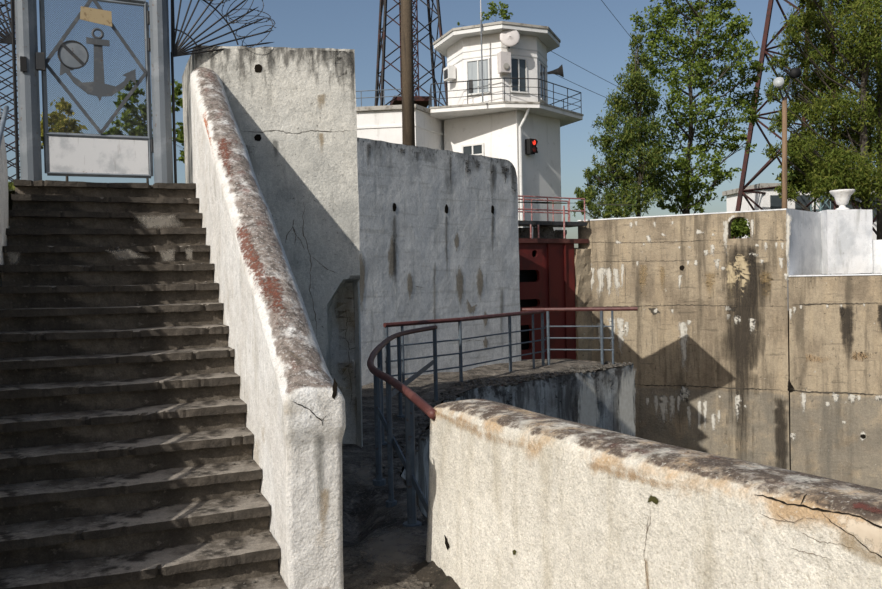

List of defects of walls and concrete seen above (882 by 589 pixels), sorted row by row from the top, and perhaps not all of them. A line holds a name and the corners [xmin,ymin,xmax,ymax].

leakage [310,50,354,89]
corrosion [203,114,234,180]
corrosion [235,224,287,324]
crack [285,203,334,331]
leakage [591,264,624,294]
crack [292,310,354,426]
leakage [597,317,629,349]
leakage [679,320,691,368]
leakage [687,214,791,440]
leakage [840,304,853,351]
leakage [646,386,720,428]
crack [757,494,882,558]